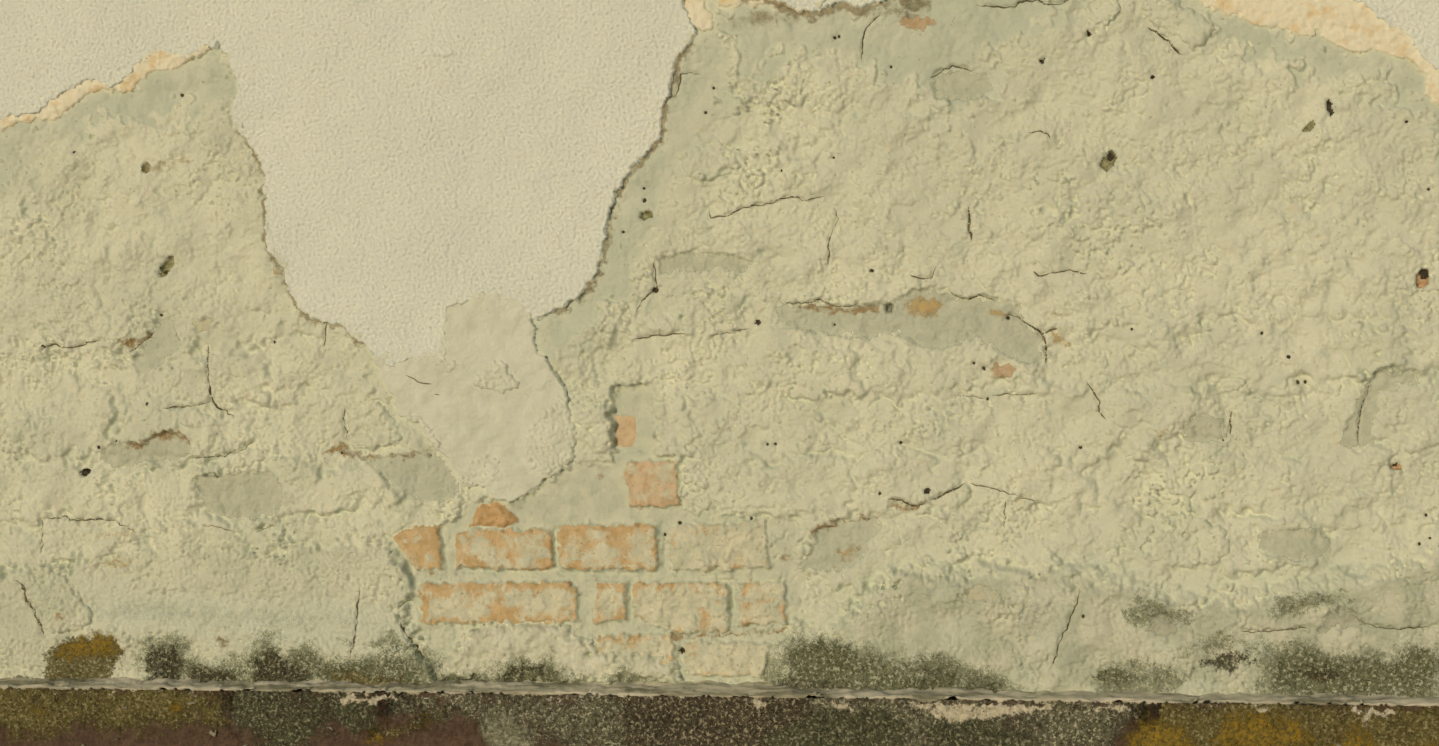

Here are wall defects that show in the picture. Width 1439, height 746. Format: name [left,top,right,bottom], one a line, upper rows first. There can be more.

flaking render [0,44,212,132]
flaking render [1199,0,1439,106]
crack [43,340,96,348]
flaking render [776,287,1043,378]
crack [910,267,1057,361]
crack [130,330,255,459]
flaking render [1340,366,1419,449]
crack [41,515,135,549]
spalling [349,291,882,684]
crack [16,580,44,638]
crack [348,592,360,663]
water stain [135,630,1439,746]